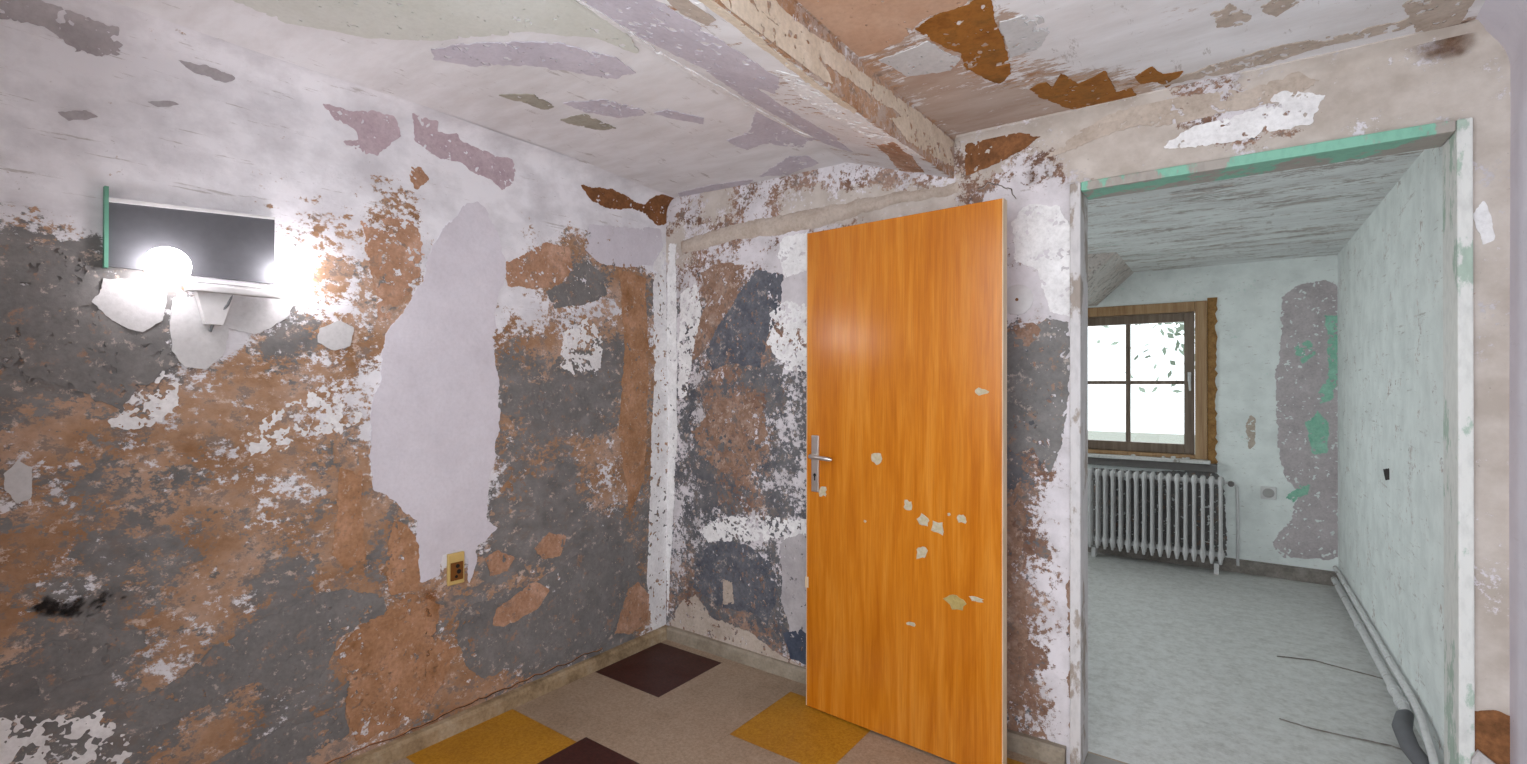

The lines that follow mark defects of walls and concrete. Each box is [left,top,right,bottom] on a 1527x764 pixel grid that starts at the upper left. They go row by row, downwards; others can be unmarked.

peeling [58,110,98,121]
peeling [0,244,182,430]
peeling [179,60,235,83]
peeling [233,0,1050,668]
peeling [1007,204,1070,472]
peeling [1246,415,1256,449]
peeling [1273,280,1338,560]
peeling [1473,201,1495,245]
peeling [0,521,457,764]
peeling [1007,481,1029,732]